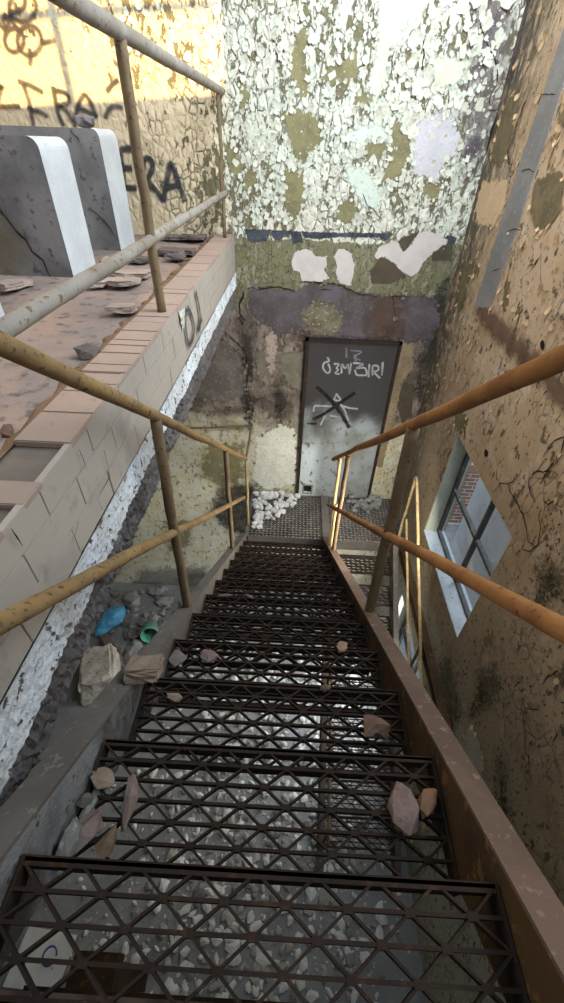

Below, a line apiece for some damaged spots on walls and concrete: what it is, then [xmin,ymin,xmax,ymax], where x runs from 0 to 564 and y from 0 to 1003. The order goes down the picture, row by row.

peeling [40,3,115,57]
crack [0,211,51,277]
flaking render [91,0,564,471]
damp [240,335,254,430]
damp [270,384,288,424]
damp [200,443,245,491]
crack [494,436,564,552]